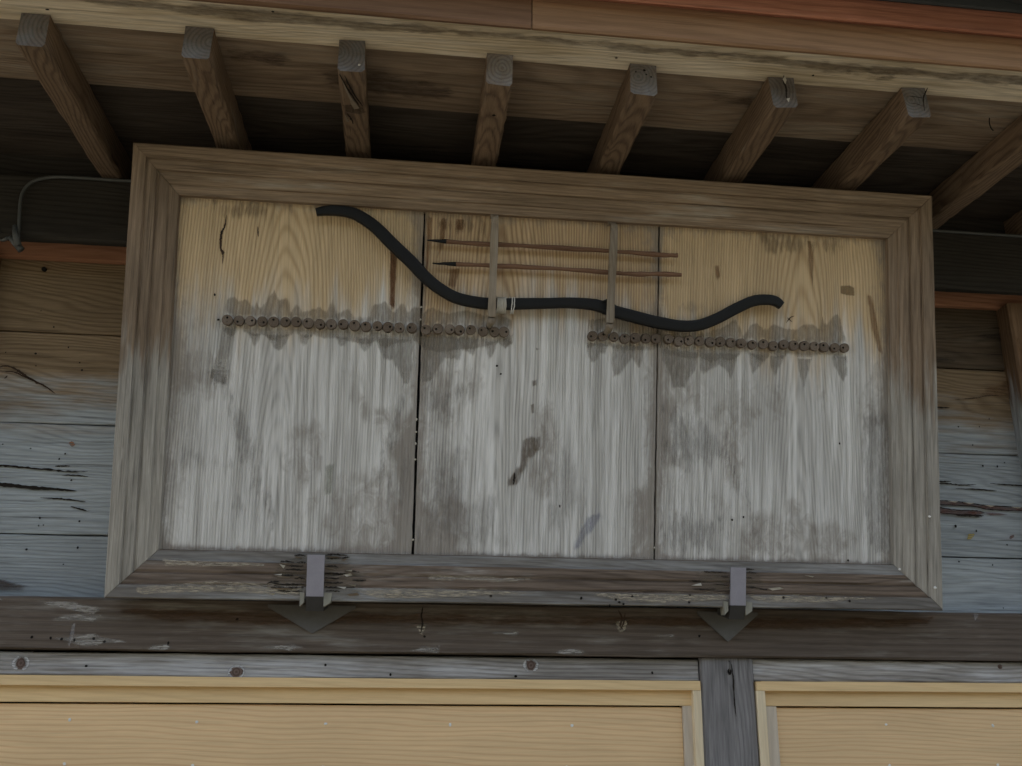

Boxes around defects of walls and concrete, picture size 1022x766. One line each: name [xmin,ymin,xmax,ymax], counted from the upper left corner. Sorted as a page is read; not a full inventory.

crack [219,215,227,264]
crack [0,365,54,393]
crack [0,465,88,511]
crack [939,481,1022,517]